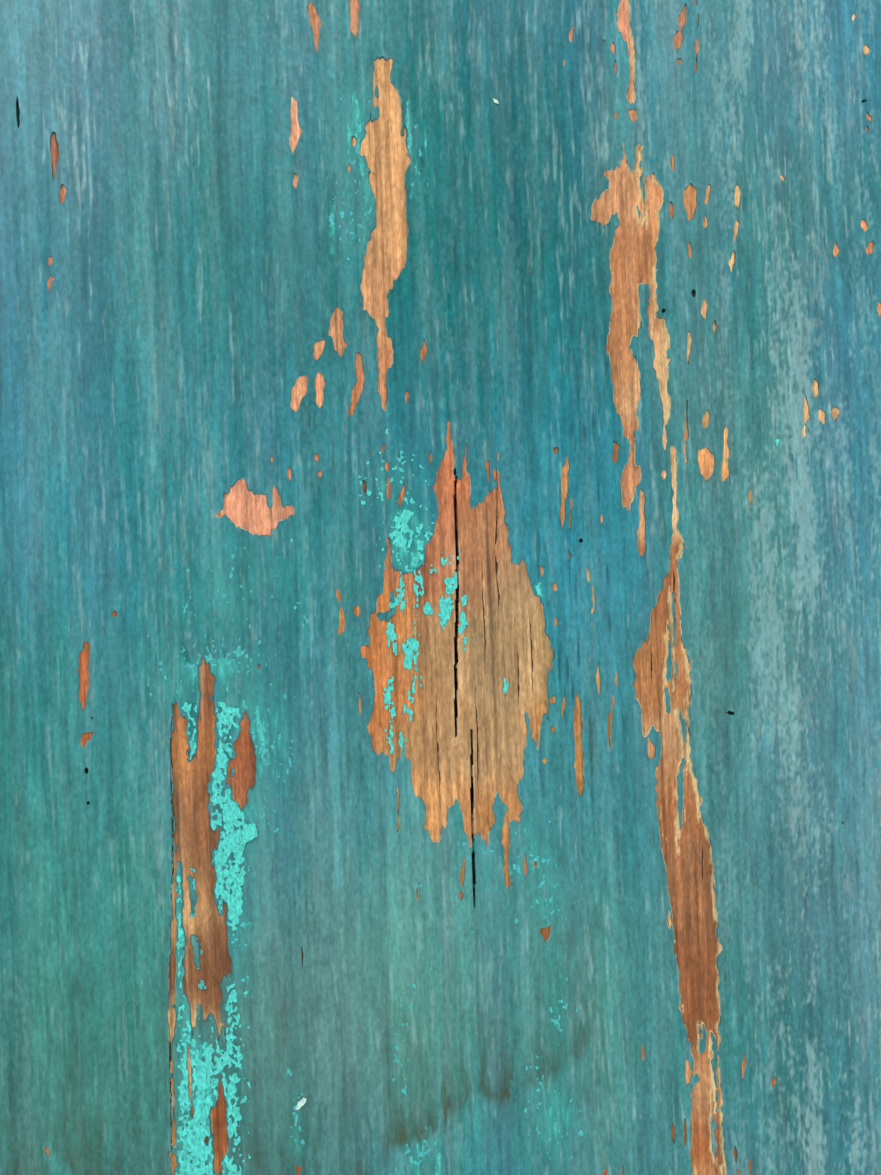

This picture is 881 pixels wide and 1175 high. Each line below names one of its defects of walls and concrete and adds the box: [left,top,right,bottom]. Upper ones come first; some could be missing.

peeling [289,56,429,417]
peeling [147,478,301,1175]
peeling [336,419,585,957]
crack [436,466,500,911]
crack [517,618,533,699]
peeling [587,567,595,627]
peeling [589,142,753,1175]
peeling [284,1092,306,1145]
peeling [378,984,416,1095]